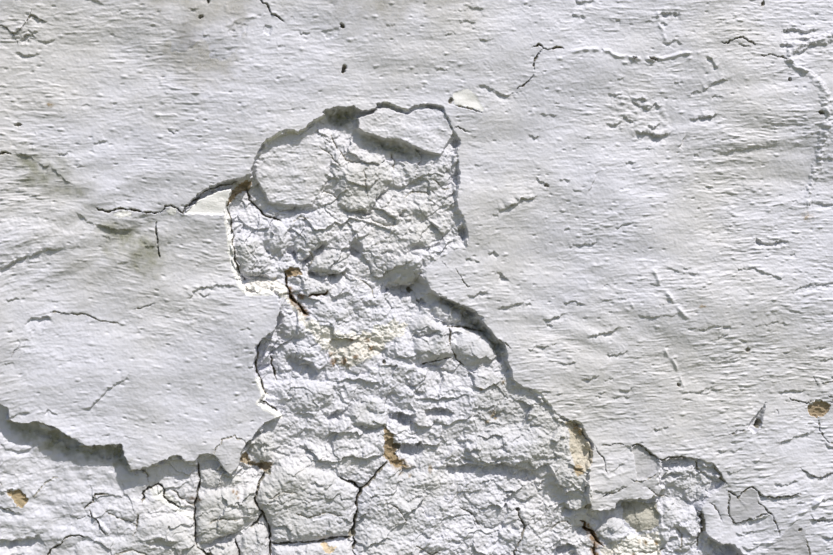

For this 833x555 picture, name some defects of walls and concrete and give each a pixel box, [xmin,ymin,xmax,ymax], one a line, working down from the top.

crack [98,181,311,257]
crack [227,208,245,279]
crack [319,134,369,199]
crack [405,179,450,198]
spalling [0,89,770,555]
peeling [807,399,831,418]
crack [47,435,387,555]
crack [513,510,526,555]
crack [549,520,605,554]
crack [589,443,801,554]